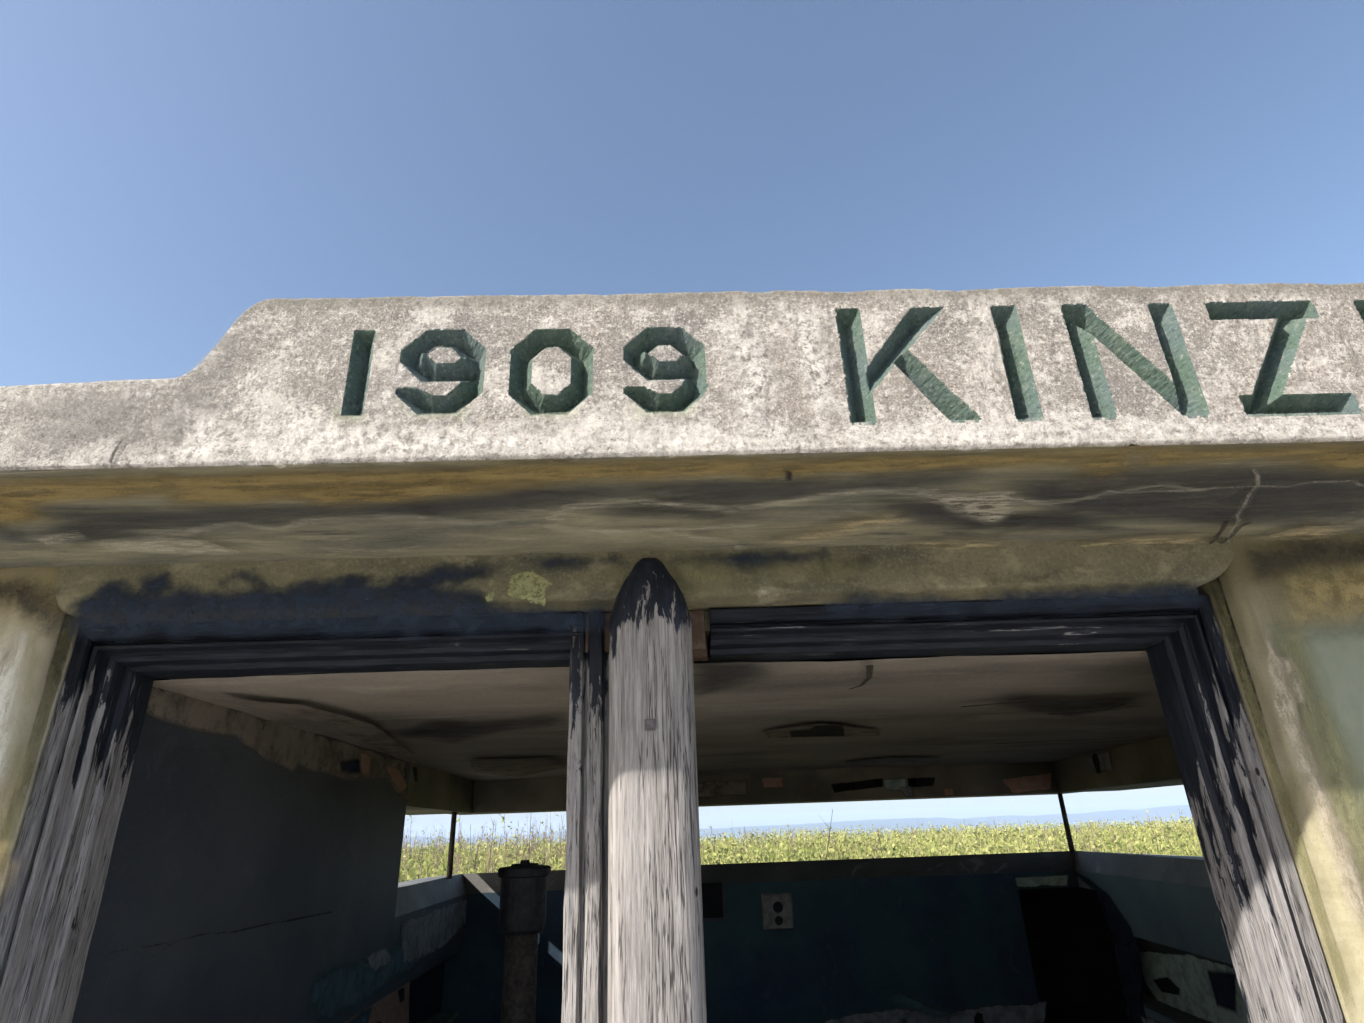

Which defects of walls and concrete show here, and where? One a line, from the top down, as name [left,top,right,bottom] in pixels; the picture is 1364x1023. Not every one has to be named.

water stain [40,512,378,553]
peeling [485,570,553,607]
water stain [611,474,1364,621]
crack [1169,469,1363,544]
water stain [0,565,610,856]
peeling [1266,628,1364,918]